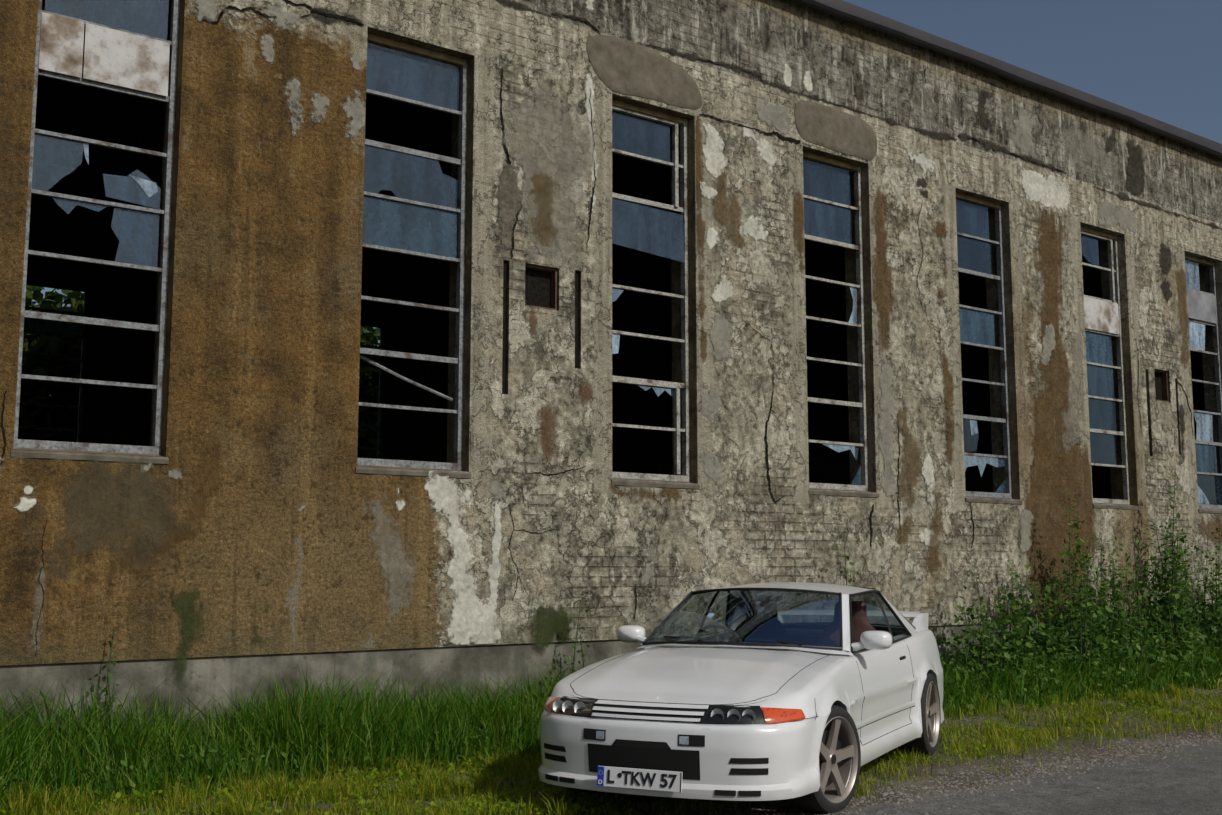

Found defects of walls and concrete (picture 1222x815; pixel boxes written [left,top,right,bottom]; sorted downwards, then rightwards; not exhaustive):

crack [196,0,312,23]
leakage [783,63,813,92]
crack [500,67,511,166]
peeling [700,122,726,199]
peeling [743,124,778,173]
leakage [908,151,937,178]
leakage [1011,107,1070,212]
crack [511,206,522,257]
peeling [706,226,720,249]
peeling [739,215,768,241]
crack [749,324,784,503]
leakage [1020,509,1034,553]